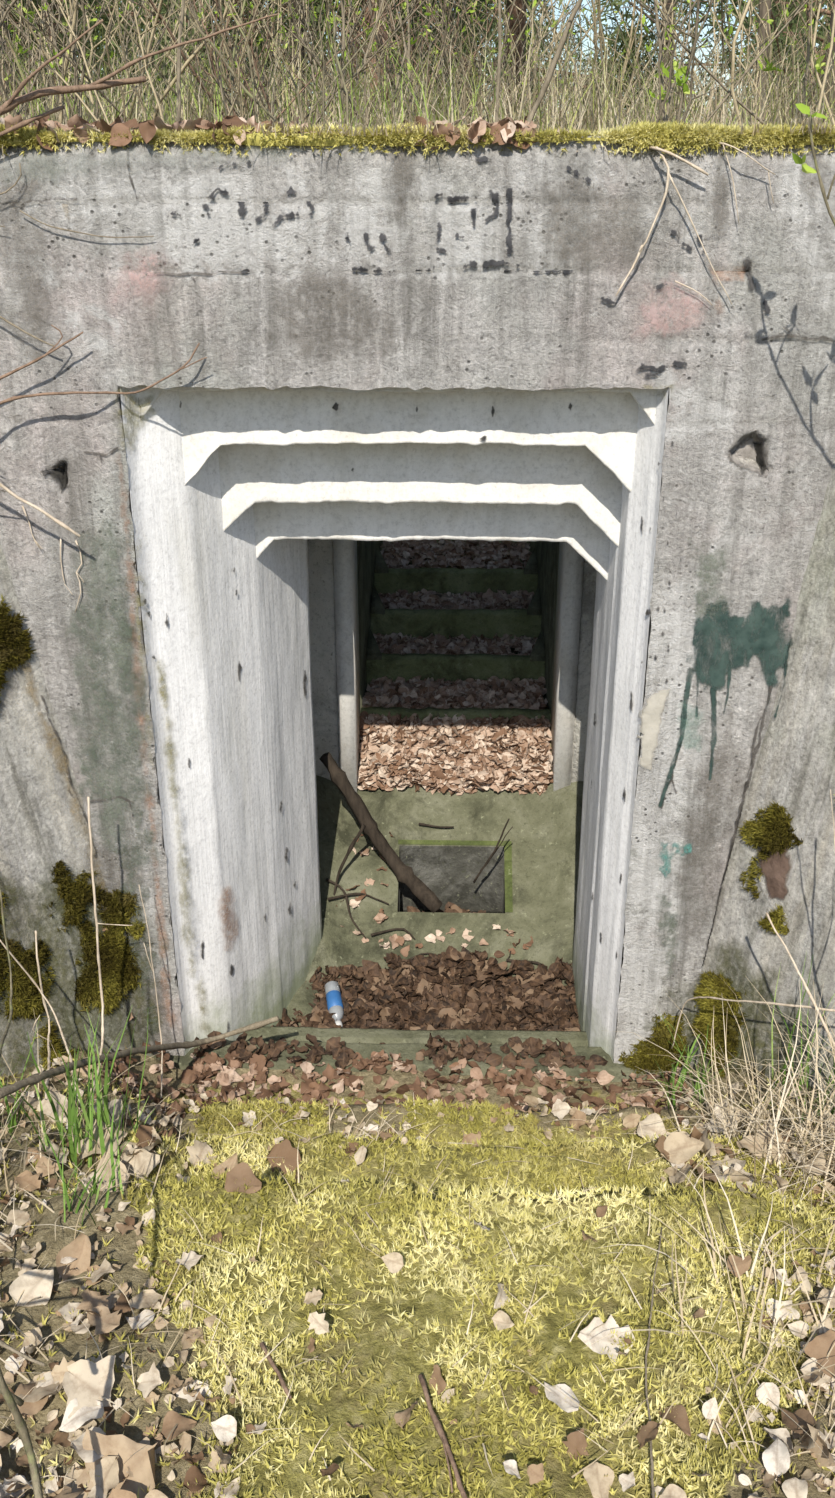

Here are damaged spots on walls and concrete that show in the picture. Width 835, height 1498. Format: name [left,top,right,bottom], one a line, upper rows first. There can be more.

spalling [729,432,769,476]
spalling [41,462,68,493]